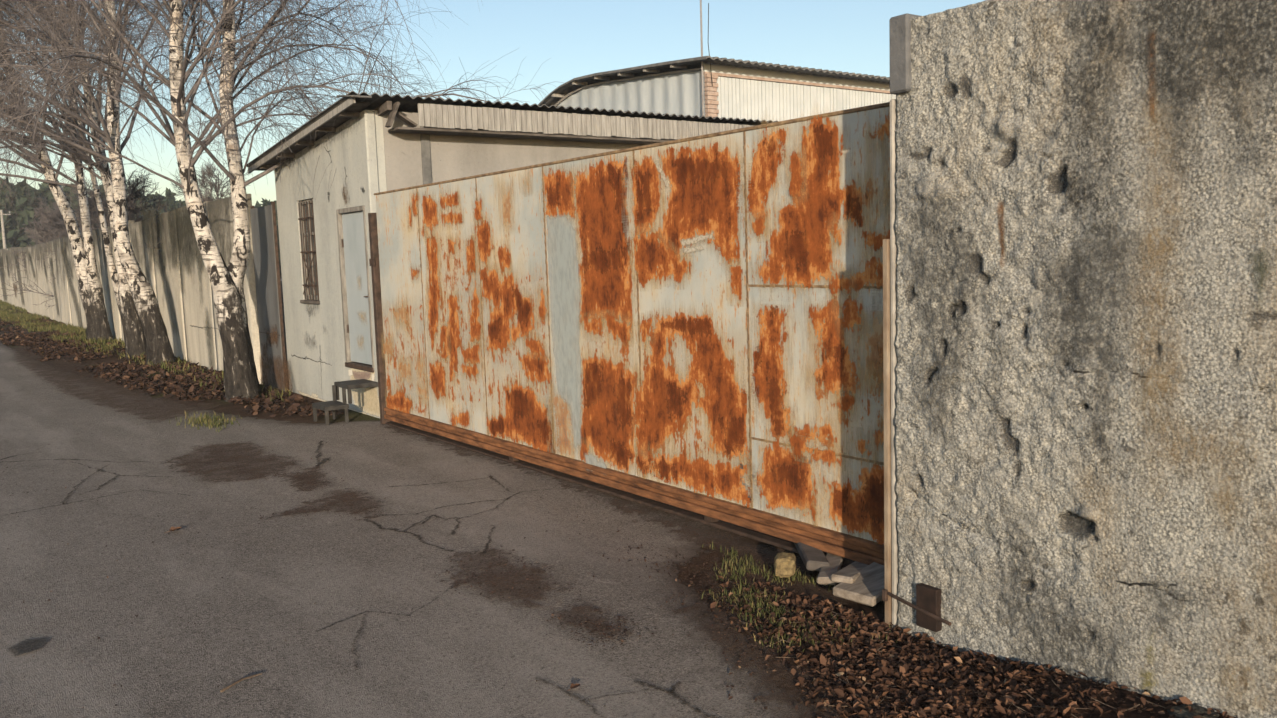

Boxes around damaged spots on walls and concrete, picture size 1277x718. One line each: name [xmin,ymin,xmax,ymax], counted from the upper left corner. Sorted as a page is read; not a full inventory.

damp [1068,0,1277,133]
spalling [943,75,971,99]
spalling [910,147,949,167]
spalling [983,138,1017,168]
spalling [1042,154,1068,194]
damp [0,248,82,328]
damp [141,208,203,329]
corrosion [383,113,890,545]
spalling [947,300,966,318]
spalling [969,254,990,284]
damp [1042,245,1126,357]
spalling [1058,511,1098,541]